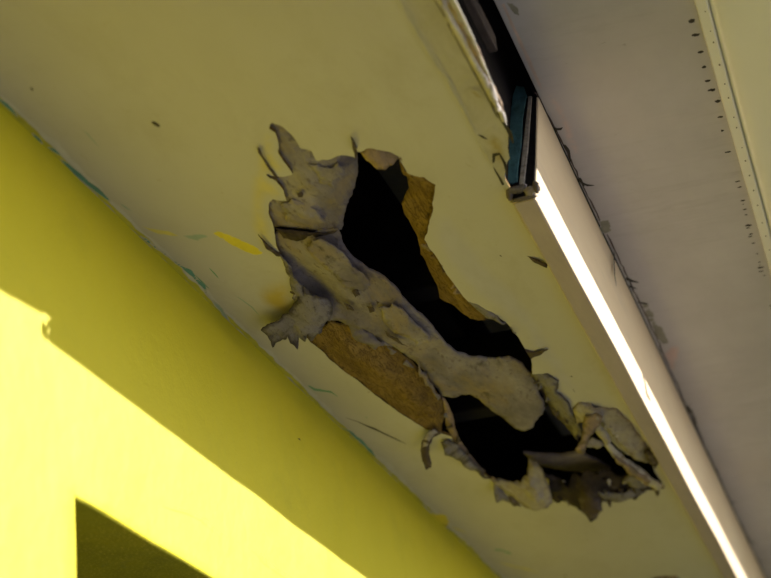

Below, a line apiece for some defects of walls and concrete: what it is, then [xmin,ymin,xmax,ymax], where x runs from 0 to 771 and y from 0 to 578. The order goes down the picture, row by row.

peeling [494,485,521,507]
peeling [598,474,649,503]